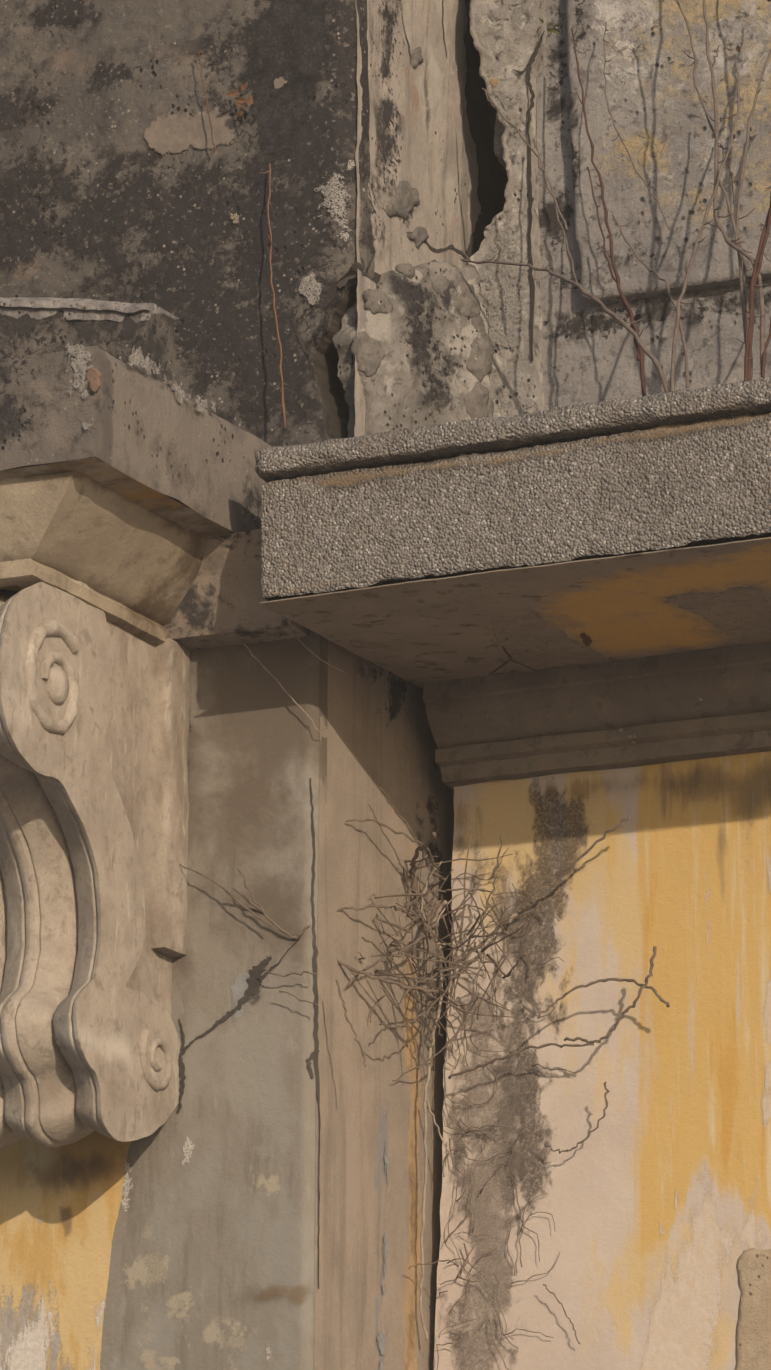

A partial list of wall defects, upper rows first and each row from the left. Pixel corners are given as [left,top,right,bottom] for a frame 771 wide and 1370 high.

leakage [250,0,329,152]
flaking render [410,47,423,68]
crack [406,0,545,361]
crack [290,253,381,439]
flaking render [332,181,495,438]
crack [177,778,321,1289]
leakage [448,782,589,1370]
peeling [0,1278,106,1370]